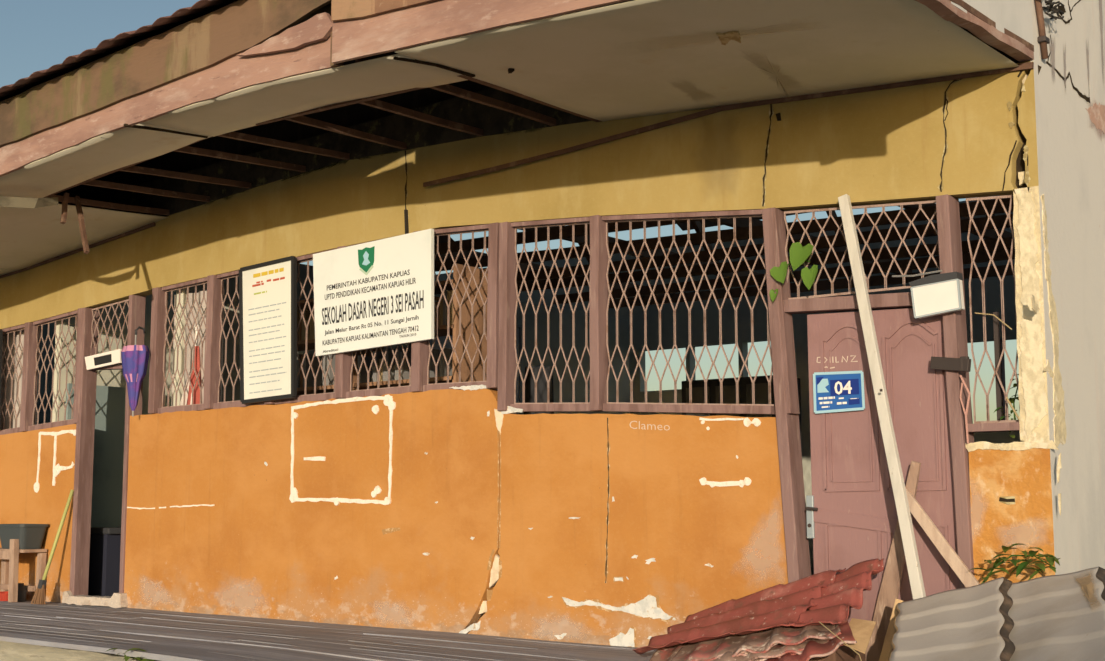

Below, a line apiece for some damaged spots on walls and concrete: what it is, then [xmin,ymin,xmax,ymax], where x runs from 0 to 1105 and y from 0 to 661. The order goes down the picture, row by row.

crack [402,150,410,219]
crack [761,104,781,207]
crack [938,79,962,192]
crack [1002,0,1090,191]
spalling [1085,103,1105,133]
flaking render [965,192,1067,516]
crack [459,409,504,634]
crack [603,418,611,583]
peeling [548,594,677,647]